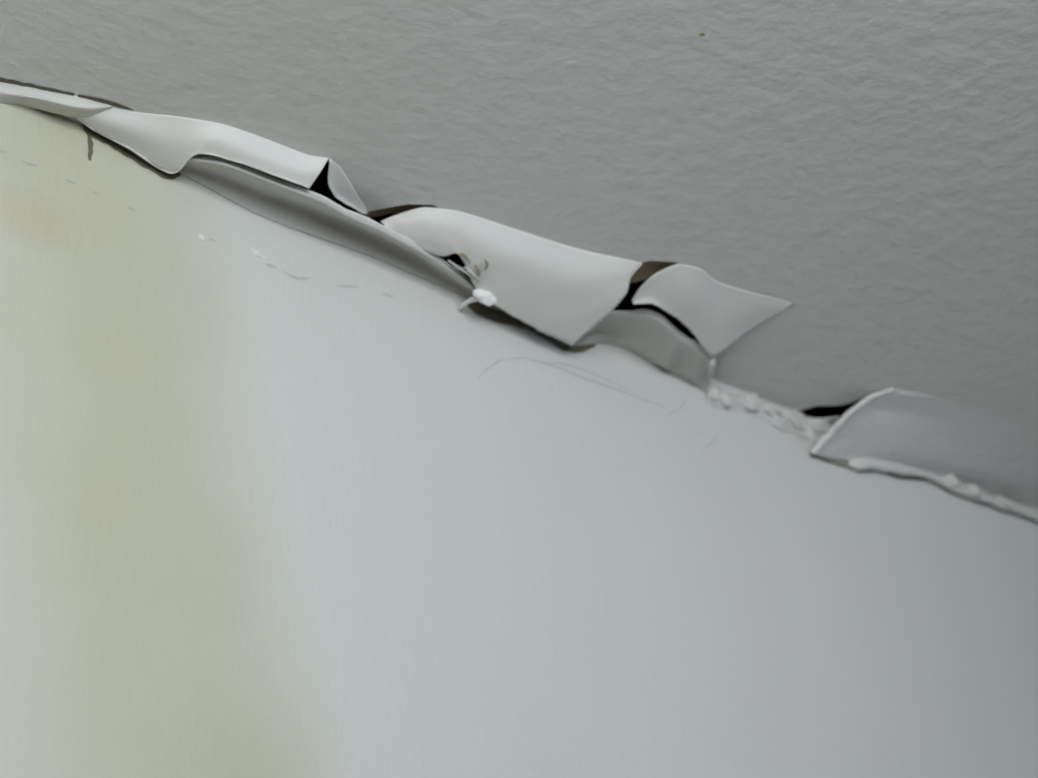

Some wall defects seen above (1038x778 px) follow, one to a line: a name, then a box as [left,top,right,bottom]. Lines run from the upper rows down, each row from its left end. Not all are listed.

crack [0,78,132,110]
crack [83,128,93,161]
peeling [76,107,368,215]
peeling [380,207,794,356]
peeling [706,385,1038,505]